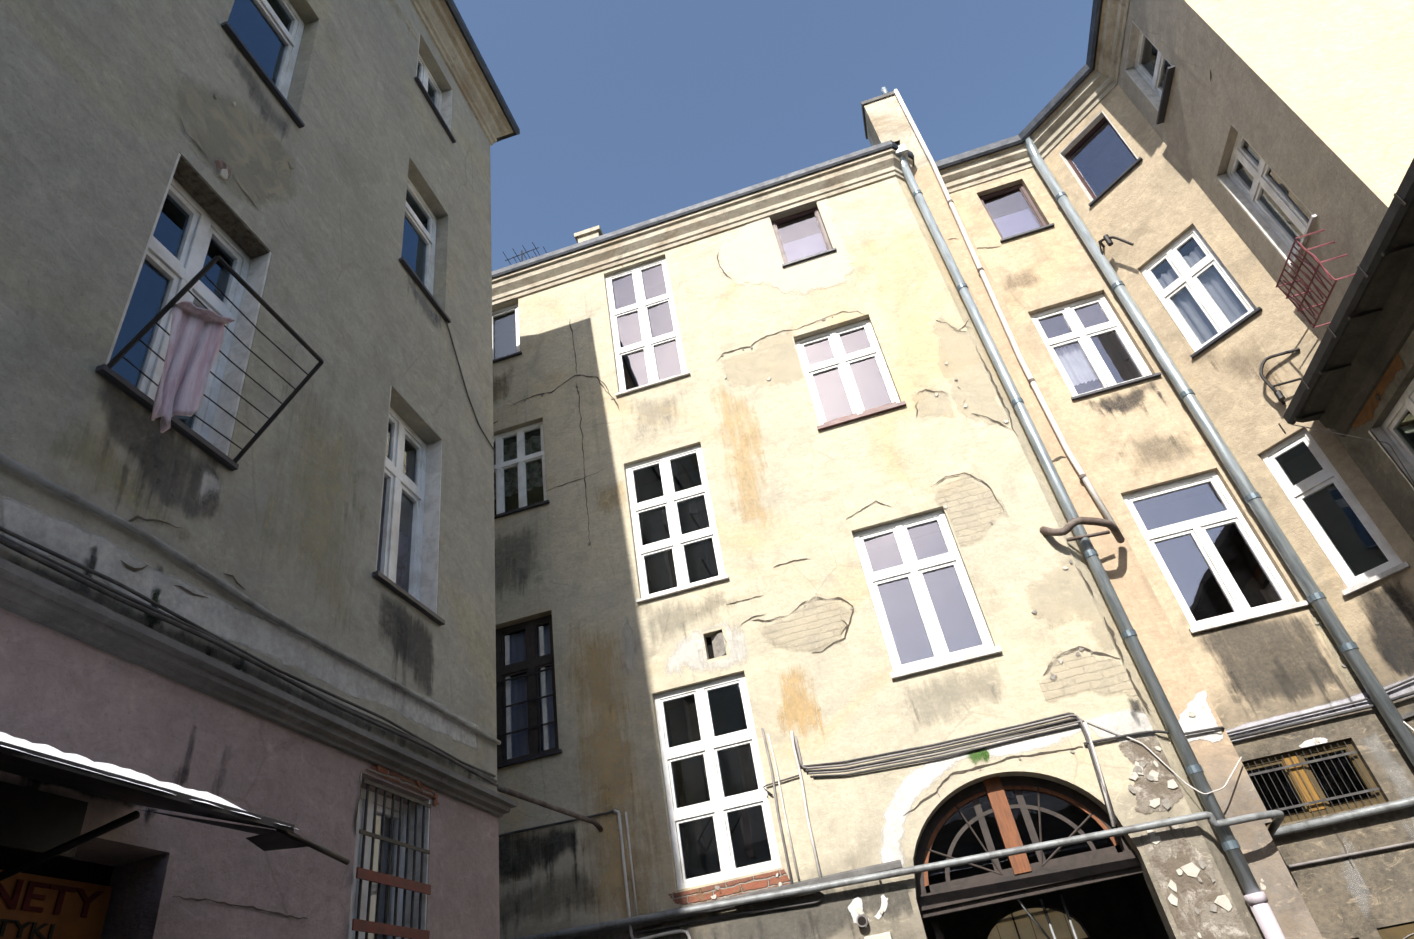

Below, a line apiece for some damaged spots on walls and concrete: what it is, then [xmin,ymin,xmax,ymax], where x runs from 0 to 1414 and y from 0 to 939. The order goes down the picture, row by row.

peeling [915,362,1009,428]
crack [493,322,619,546]
peeling [1179,690,1223,743]
damp [499,828,577,884]
peeling [1119,735,1251,939]